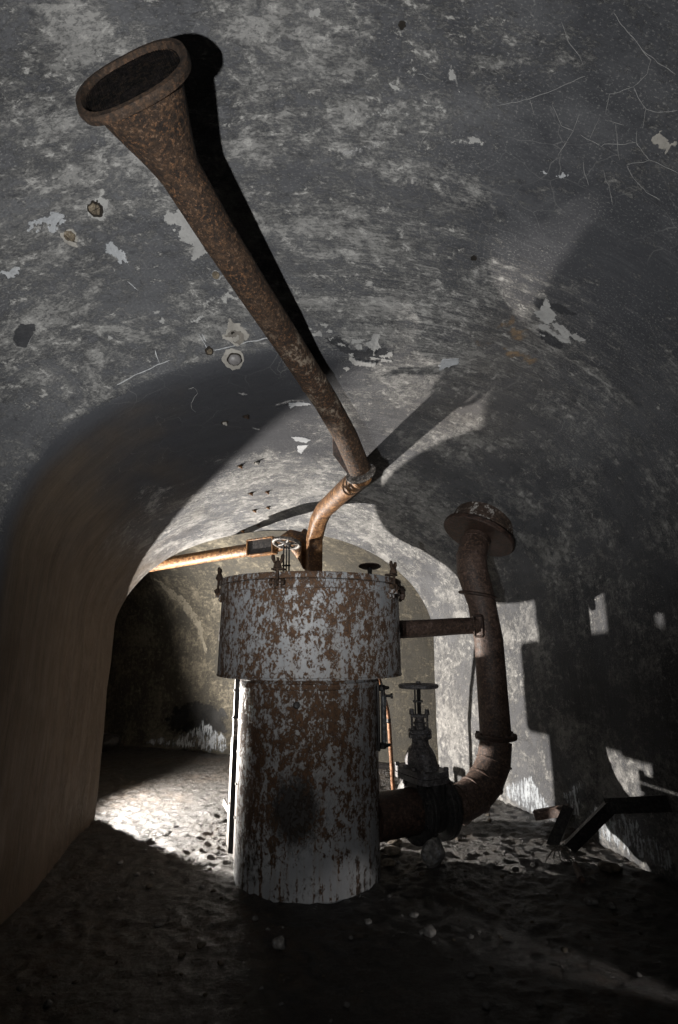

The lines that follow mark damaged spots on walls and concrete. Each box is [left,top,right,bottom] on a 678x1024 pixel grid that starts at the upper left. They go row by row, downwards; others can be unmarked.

crack [498,13,677,201]
spalling [651,130,677,154]
peeling [27,212,66,233]
peeling [164,209,208,261]
peeling [105,241,129,265]
peeling [13,324,36,348]
spalling [222,318,250,346]
peeling [308,323,393,371]
peeling [534,298,586,349]
peeling [291,436,311,454]